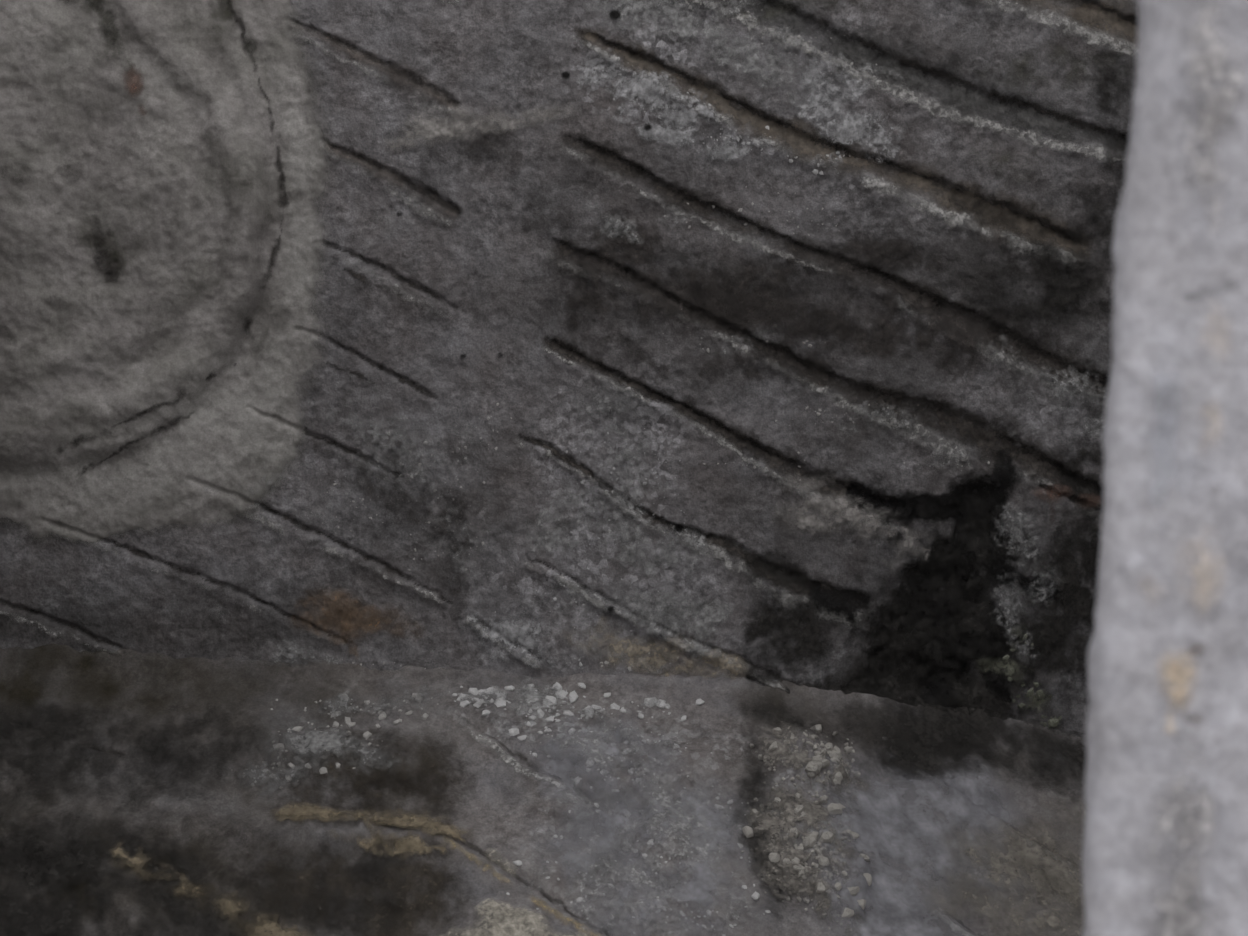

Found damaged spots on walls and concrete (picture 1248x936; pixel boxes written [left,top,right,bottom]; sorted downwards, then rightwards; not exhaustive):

crack [293,23,459,111]
crack [694,0,1139,162]
crack [324,140,460,226]
crack [577,30,1088,264]
crack [563,136,1110,397]
crack [59,396,190,474]
crack [545,237,1103,530]
crack [519,436,865,626]
crack [112,541,350,643]
leakage [0,703,460,817]
leakage [0,815,244,936]
leakage [230,847,462,936]